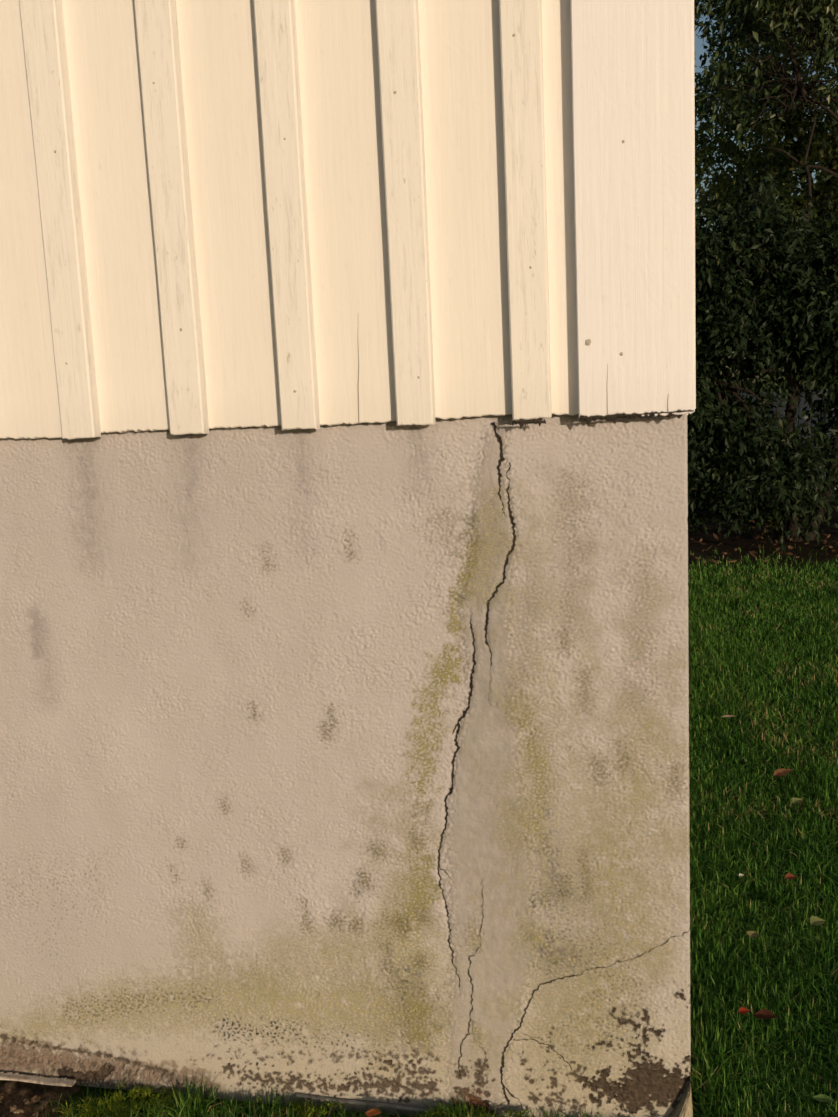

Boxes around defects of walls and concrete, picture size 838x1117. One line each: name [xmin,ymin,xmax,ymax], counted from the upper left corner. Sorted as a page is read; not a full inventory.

crack [438,422,516,1077]
leakage [214,1019,319,1048]
crack [500,929,690,1113]